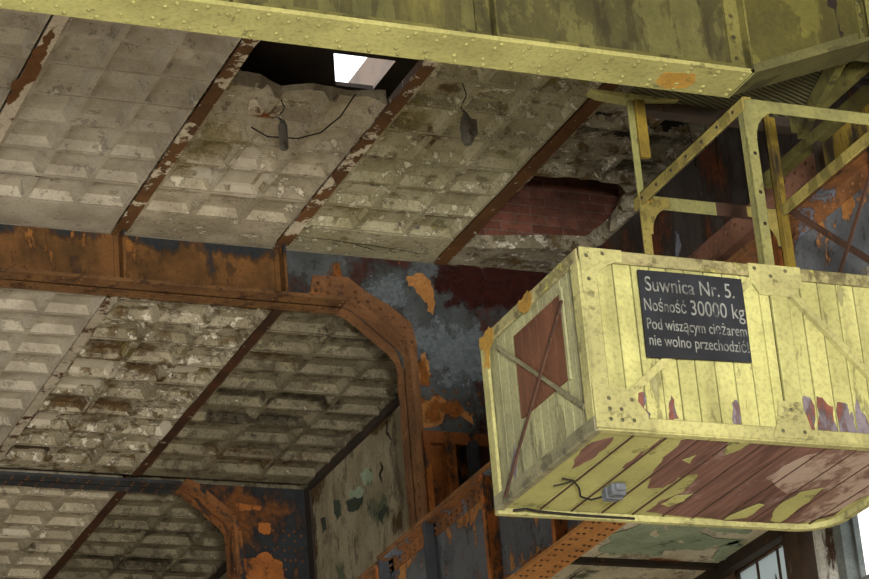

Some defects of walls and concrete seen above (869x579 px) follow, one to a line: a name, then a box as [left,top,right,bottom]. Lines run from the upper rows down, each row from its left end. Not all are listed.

rust [6,27,56,105]
spalling [647,120,683,132]
leakage [81,339,157,377]
leakage [251,352,294,362]
leakage [49,395,131,416]
leakage [210,442,296,468]
peeling [320,468,374,533]
peeling [598,437,841,562]
rust [258,523,271,535]
rust [244,552,285,579]